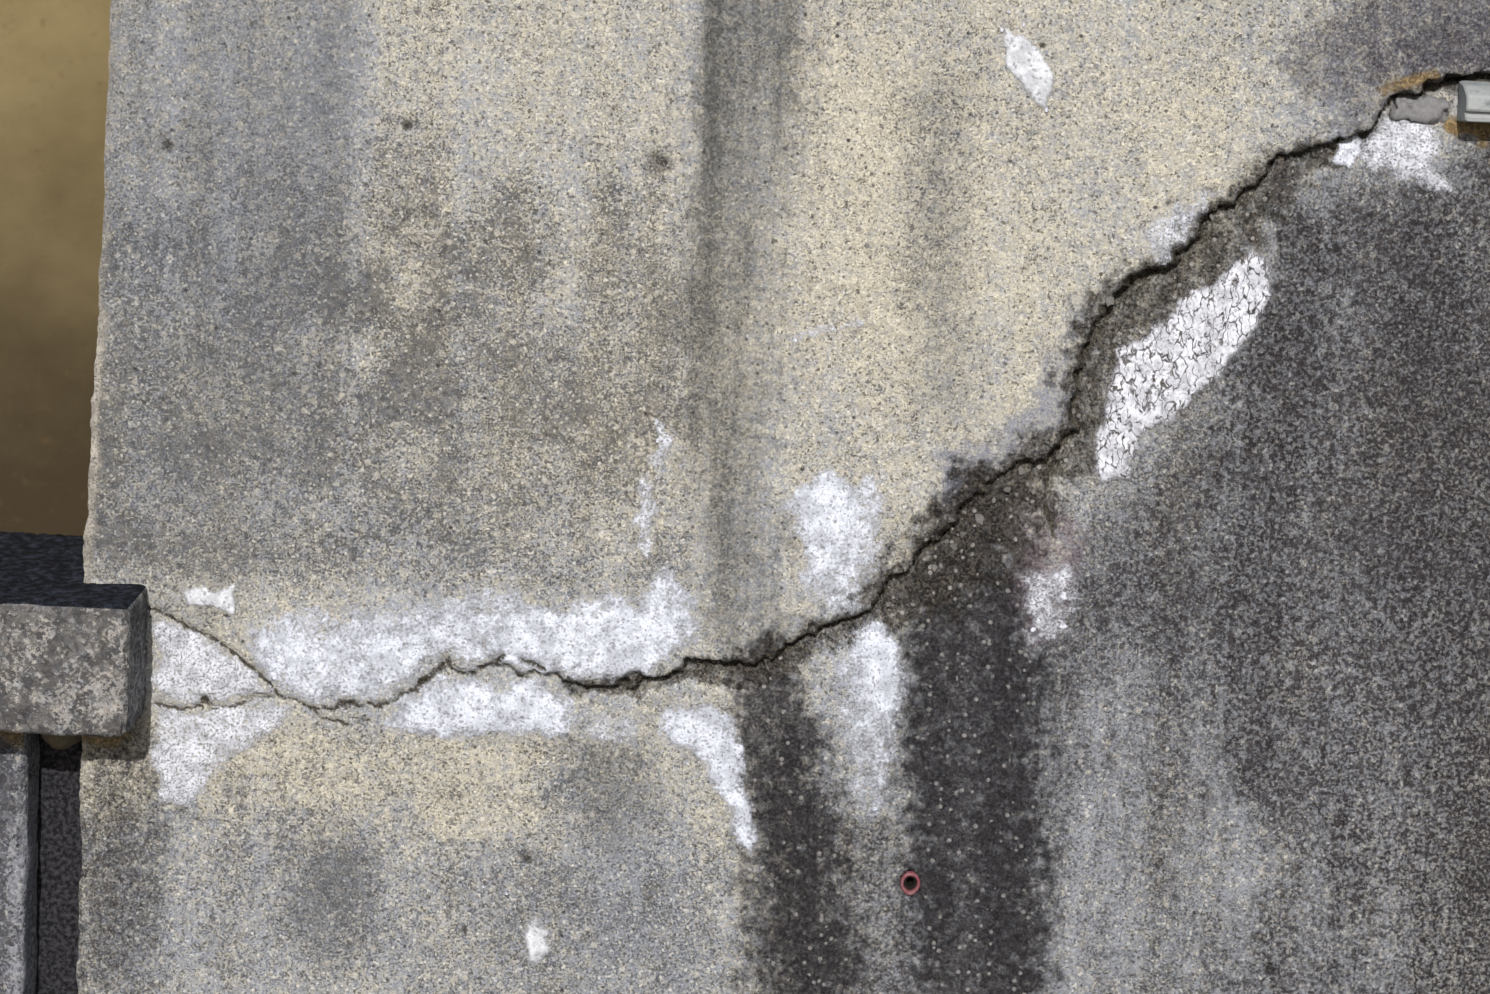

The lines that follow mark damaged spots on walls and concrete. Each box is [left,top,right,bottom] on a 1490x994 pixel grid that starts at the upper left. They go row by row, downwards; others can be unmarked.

leakage [705,0,788,166]
leakage [633,419,673,558]
crack [147,72,1490,726]
leakage [659,134,1490,994]
leakage [78,567,698,992]